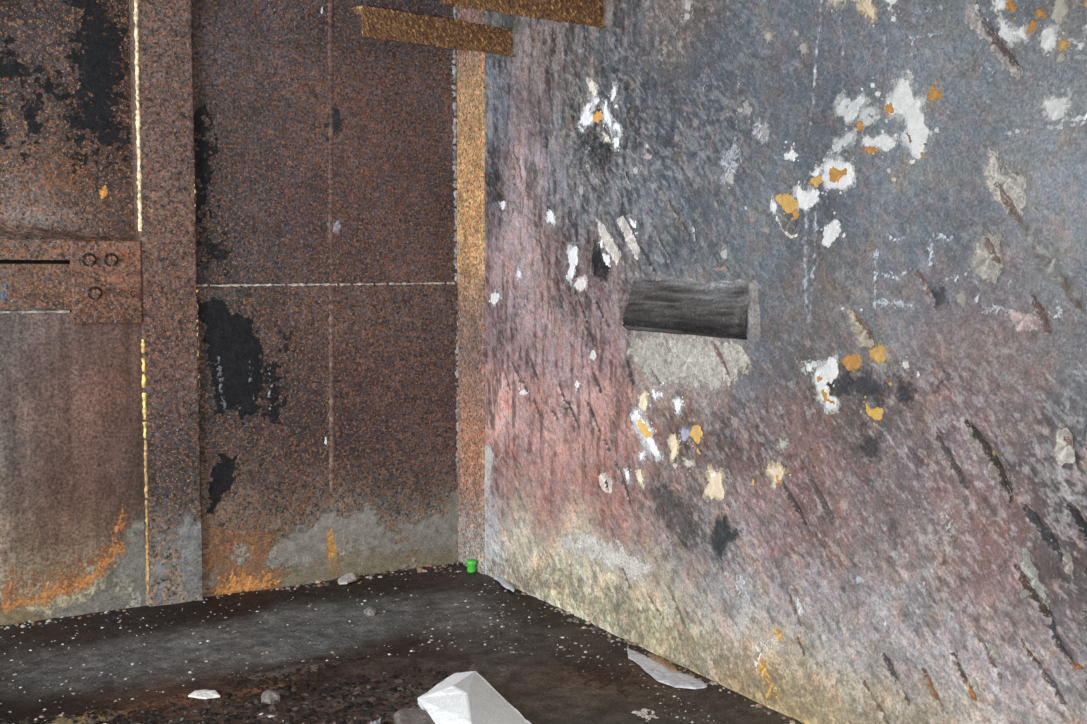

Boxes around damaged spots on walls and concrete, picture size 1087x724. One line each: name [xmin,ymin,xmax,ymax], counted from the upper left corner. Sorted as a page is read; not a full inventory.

spalling [964,0,1087,81]
corrosion [17,148,108,208]
peeling [576,76,623,200]
spalling [566,216,656,292]
peeling [814,212,846,248]
peeling [759,69,949,239]
spalling [585,326,754,505]
peeling [801,307,920,414]
corrosion [0,504,130,615]
corrosion [202,512,293,596]
water stain [489,527,883,724]
spalling [1014,547,1087,682]